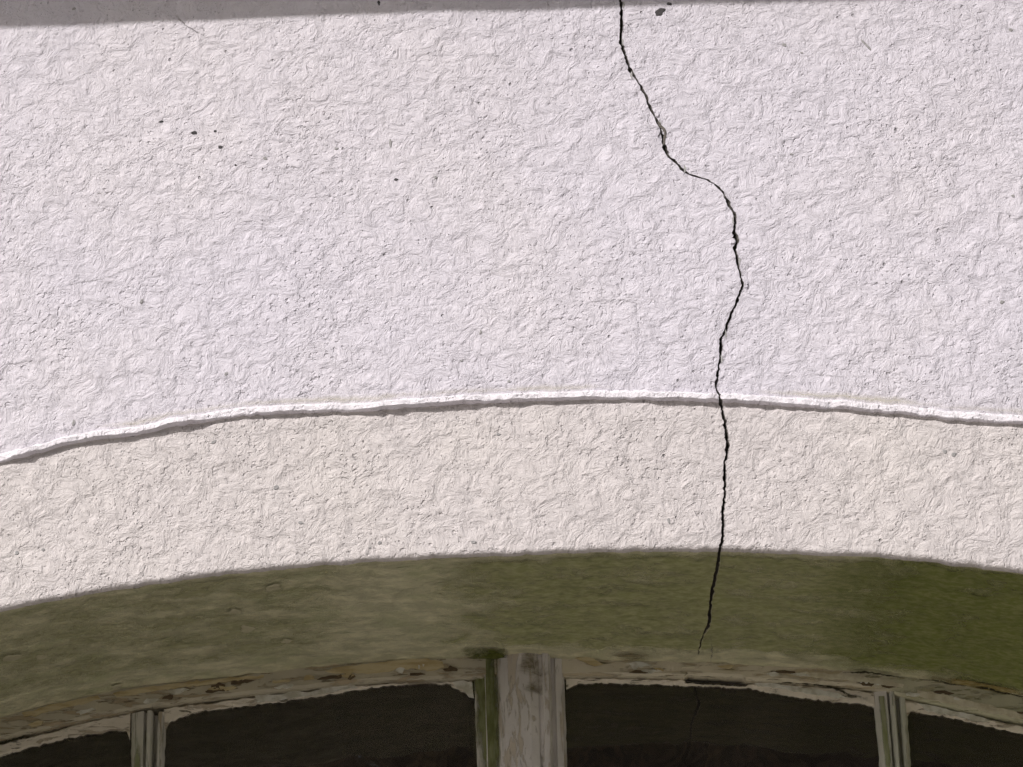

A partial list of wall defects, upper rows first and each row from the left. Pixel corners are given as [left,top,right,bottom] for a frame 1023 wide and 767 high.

crack [619,0,749,657]